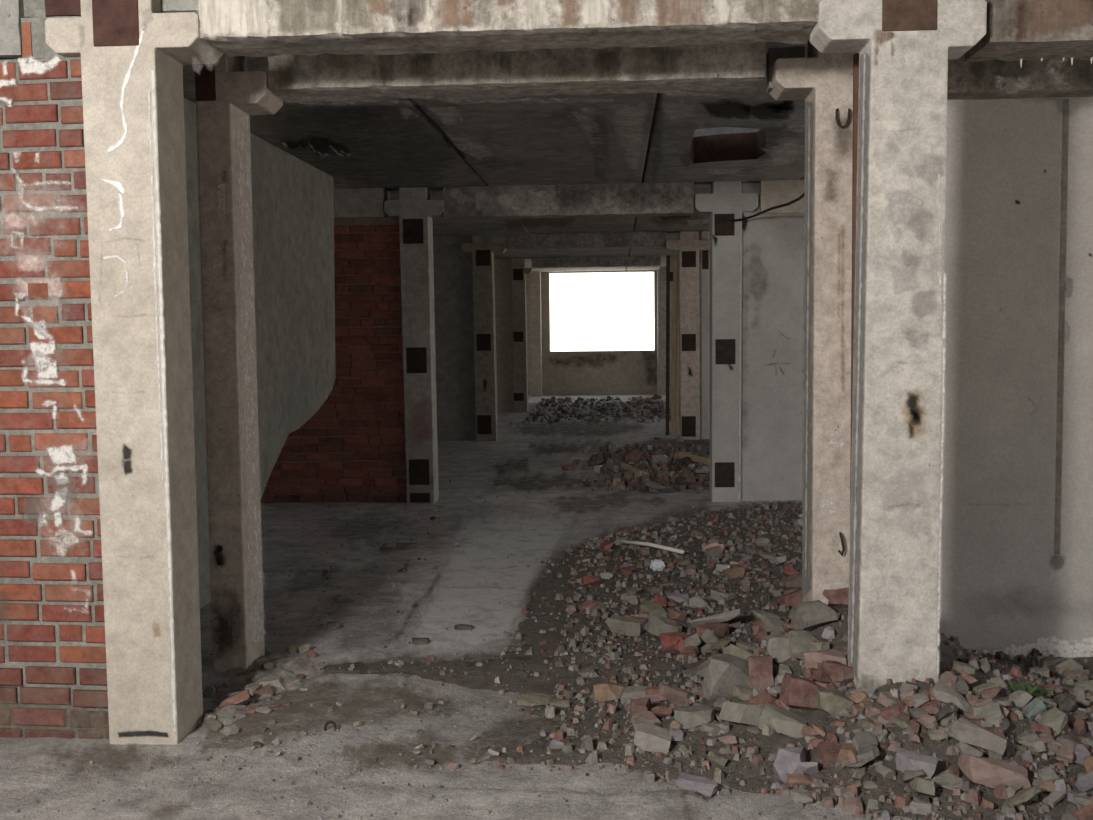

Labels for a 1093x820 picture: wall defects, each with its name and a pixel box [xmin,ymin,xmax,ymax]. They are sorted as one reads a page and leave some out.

damp [430,89,836,596]
spalling [907,395,921,436]
damp [983,635,1093,658]